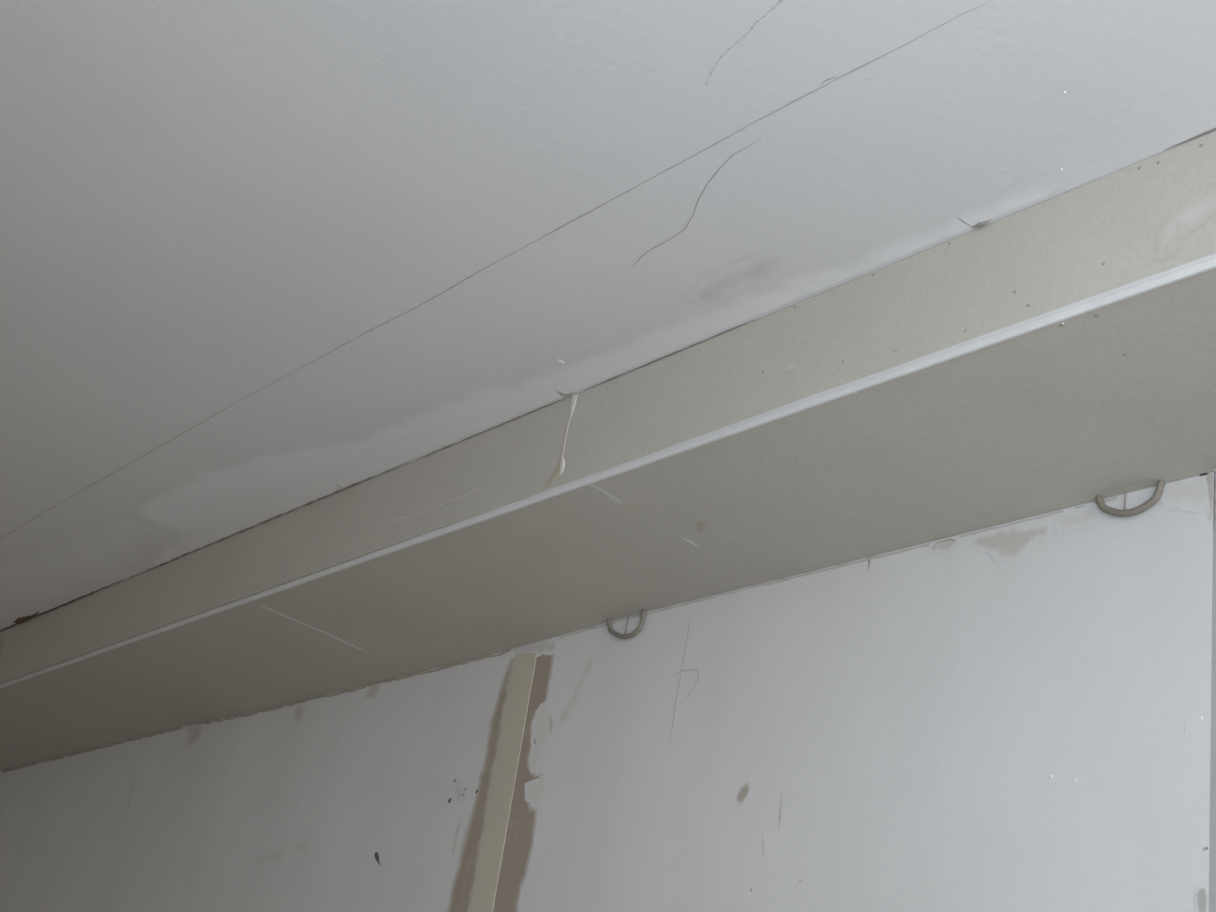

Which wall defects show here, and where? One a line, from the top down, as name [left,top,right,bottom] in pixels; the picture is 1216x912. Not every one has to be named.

crack [0,0,992,539]
crack [0,319,756,651]
spalling [929,520,1054,563]